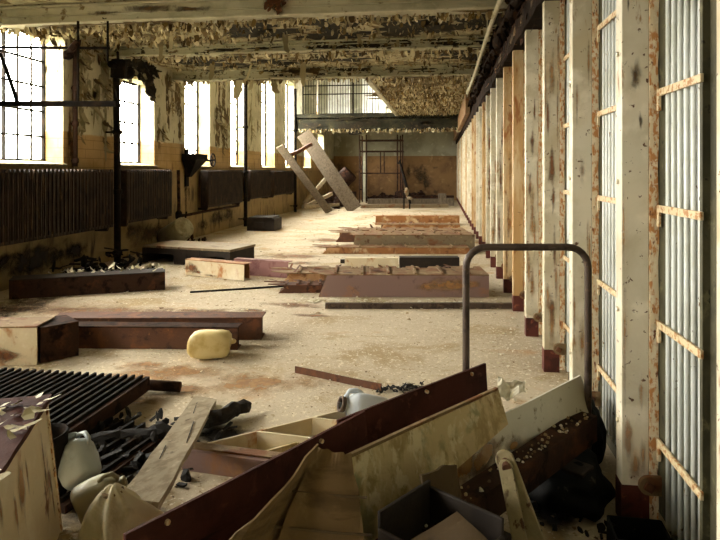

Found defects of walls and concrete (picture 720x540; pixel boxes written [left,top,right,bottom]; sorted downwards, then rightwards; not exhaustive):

peeling [0,9,506,161]